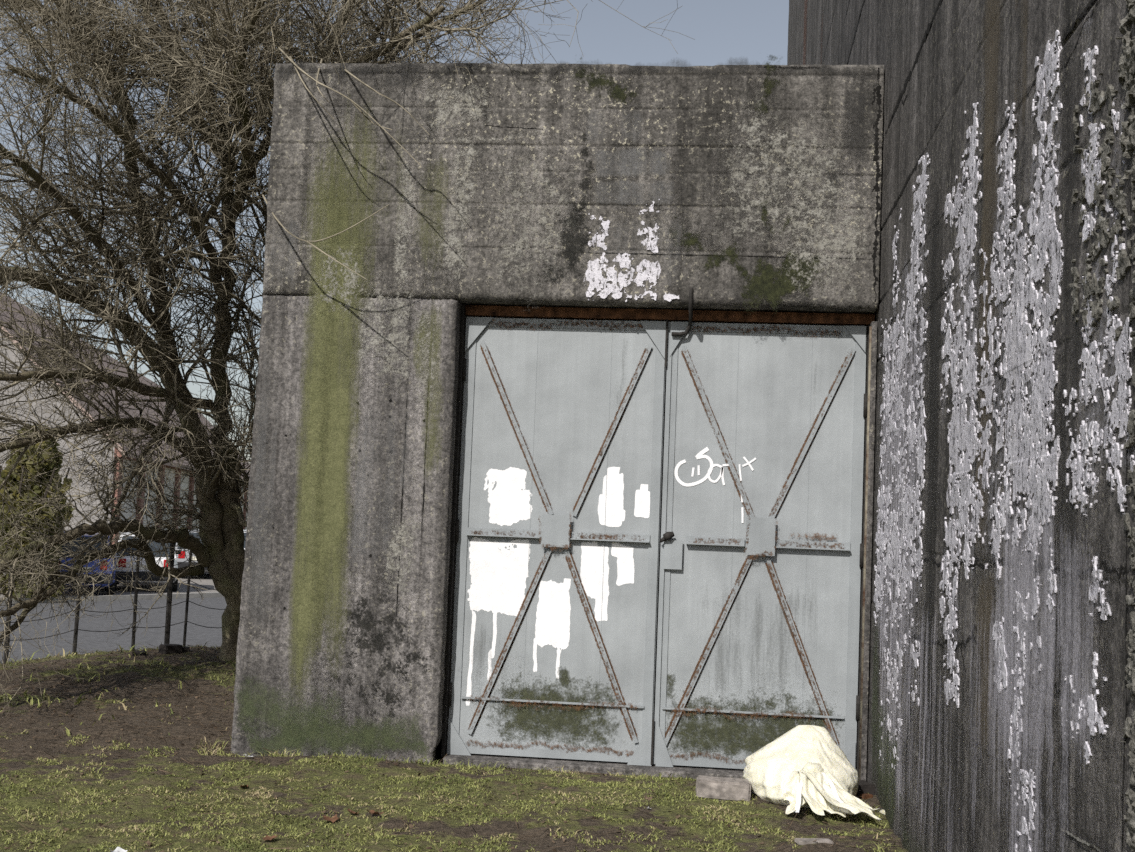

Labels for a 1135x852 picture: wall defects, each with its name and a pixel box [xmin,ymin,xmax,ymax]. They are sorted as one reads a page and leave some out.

water stain [292,136,436,716]
water stain [424,85,487,127]
water stain [441,136,512,278]
water stain [497,158,563,281]
rust [467,347,651,756]
peeling [584,199,679,302]
rust [665,350,853,763]
water stain [722,92,865,291]
crack [579,0,1099,358]
water stain [879,201,944,832]
peeling [873,0,1135,852]
water stain [976,279,1089,852]